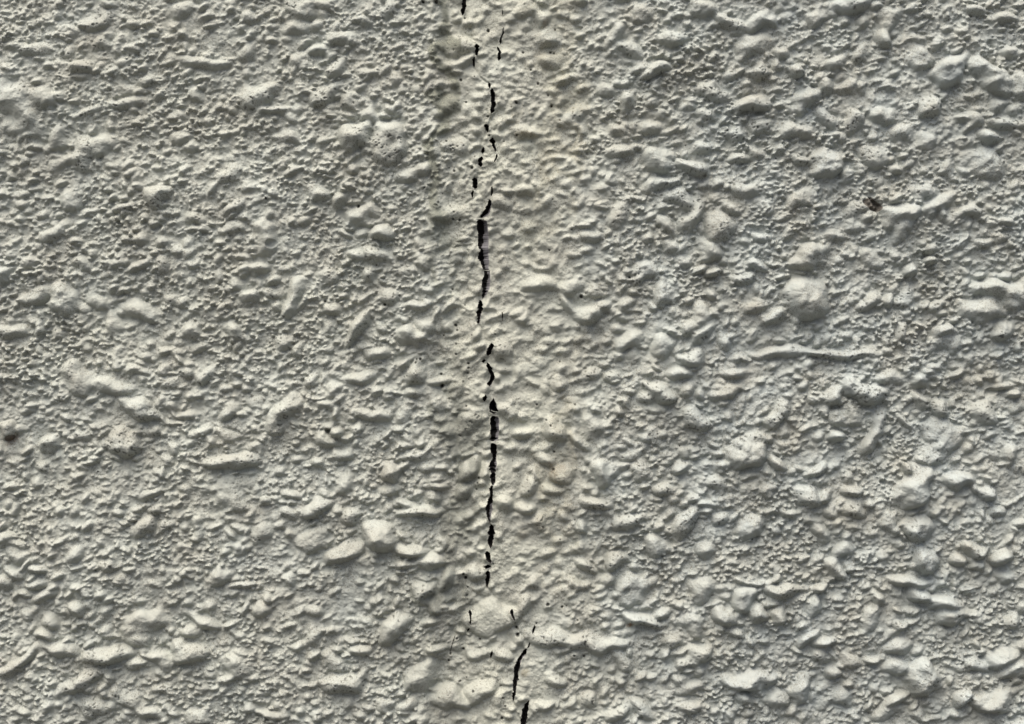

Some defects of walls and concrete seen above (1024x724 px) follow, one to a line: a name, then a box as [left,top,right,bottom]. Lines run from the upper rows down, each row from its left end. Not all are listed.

crack [459,0,467,16]
crack [470,10,505,588]
crack [449,610,473,652]
crack [489,609,536,724]